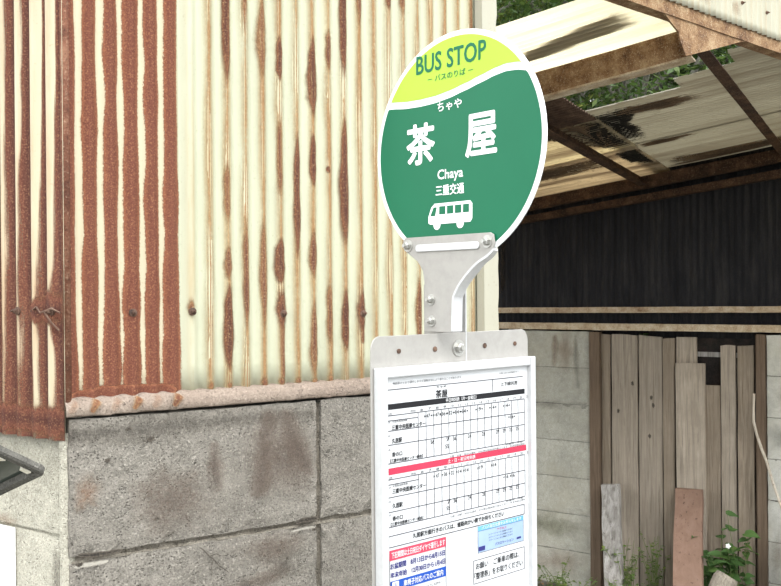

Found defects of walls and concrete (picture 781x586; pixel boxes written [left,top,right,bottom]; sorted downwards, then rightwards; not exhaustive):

corrosion [0,0,195,441]
corrosion [206,0,214,389]
corrosion [221,0,234,388]
corrosion [241,0,286,387]
corrosion [293,0,365,383]
corrosion [386,0,405,103]
corrosion [415,0,433,57]